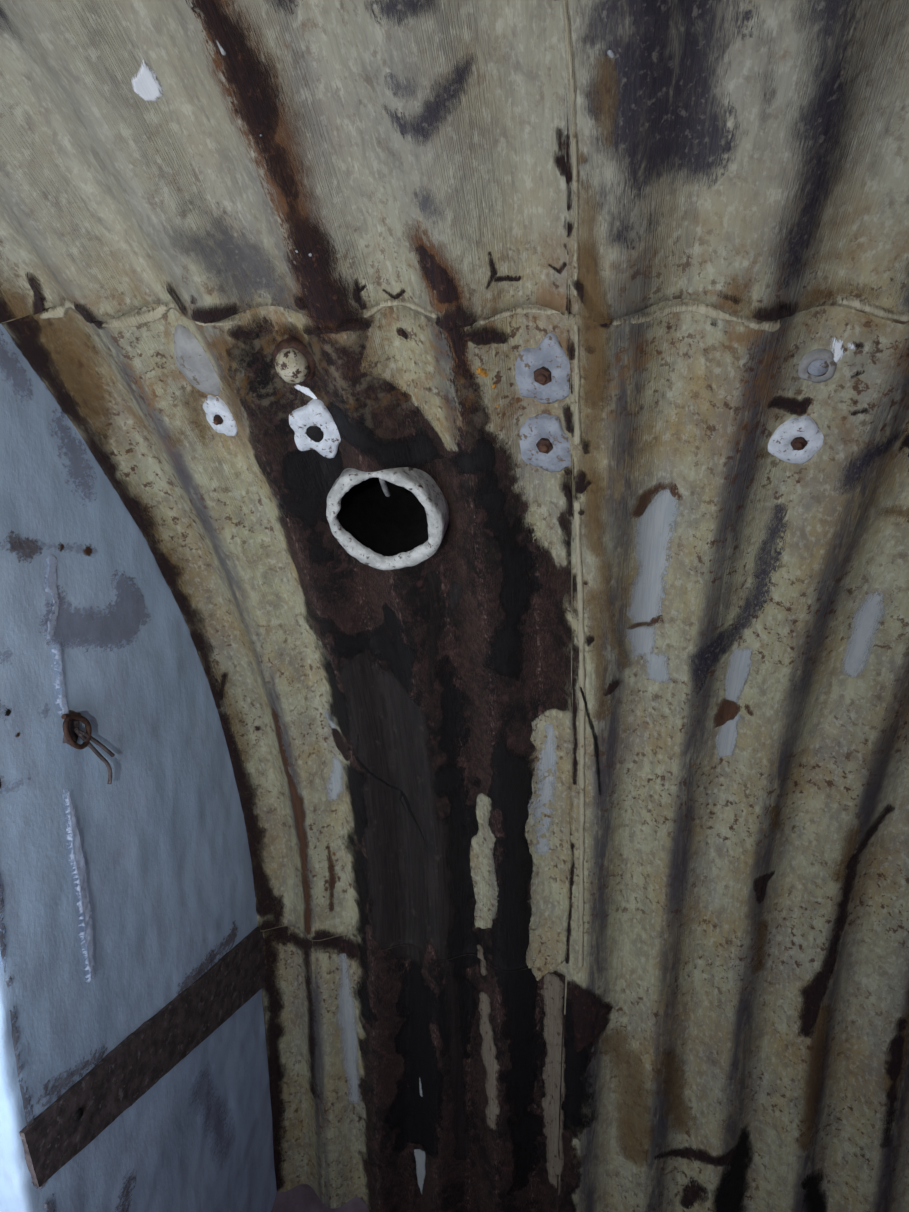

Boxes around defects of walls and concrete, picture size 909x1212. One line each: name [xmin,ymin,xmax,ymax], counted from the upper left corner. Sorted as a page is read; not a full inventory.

peeling [836,295,909,322]
rust [0,0,657,1212]
peeling [479,0,783,1195]
rust [752,870,775,973]
rust [654,1124,755,1212]